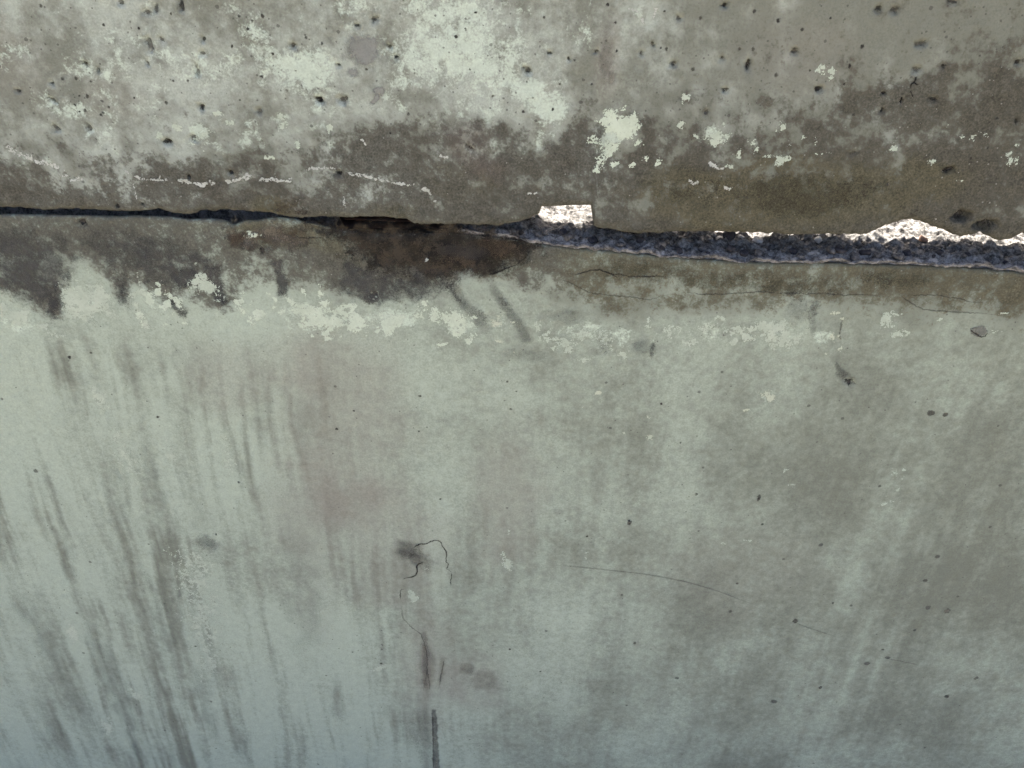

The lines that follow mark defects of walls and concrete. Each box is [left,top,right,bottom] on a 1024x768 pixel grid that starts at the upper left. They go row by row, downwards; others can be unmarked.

water stain [0,231,76,315]
water stain [89,237,229,305]
water stain [271,260,287,295]
water stain [340,262,461,304]
crack [400,540,452,598]